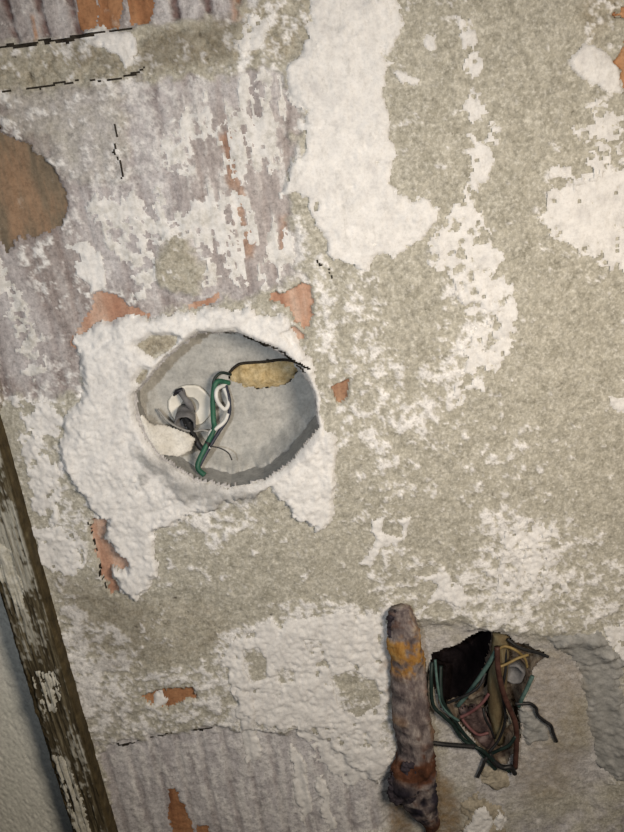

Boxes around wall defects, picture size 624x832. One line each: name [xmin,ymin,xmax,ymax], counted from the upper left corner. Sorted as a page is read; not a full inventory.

crack [0,28,132,49]
flaking render [538,42,624,272]
flaking render [65,0,518,406]
spalling [0,126,68,382]
flaking render [608,396,624,413]
flaking render [0,395,129,594]
rust [386,610,396,638]
flaking render [604,622,624,661]
rust [387,761,420,809]
spalling [167,788,209,832]